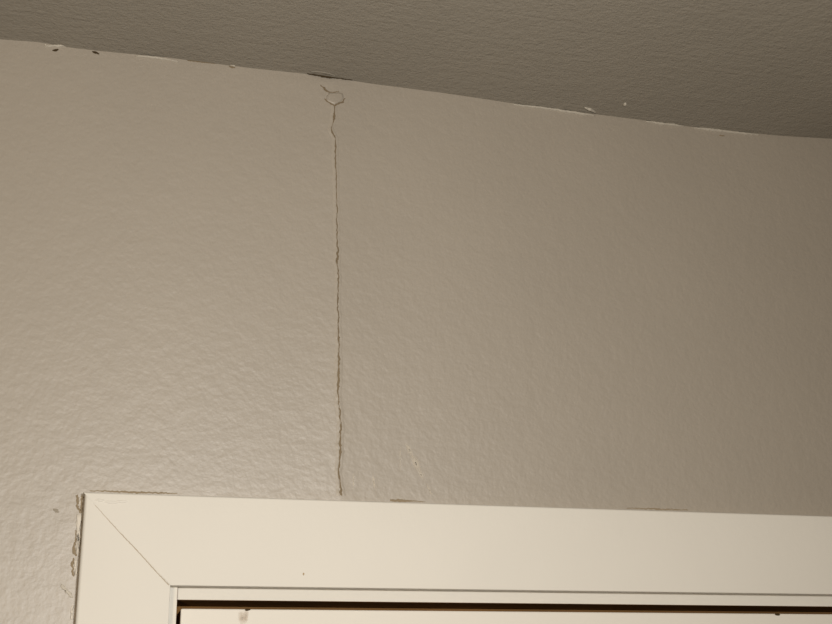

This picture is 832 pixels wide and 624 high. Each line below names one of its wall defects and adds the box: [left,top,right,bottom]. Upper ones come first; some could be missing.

crack [307,71,350,496]